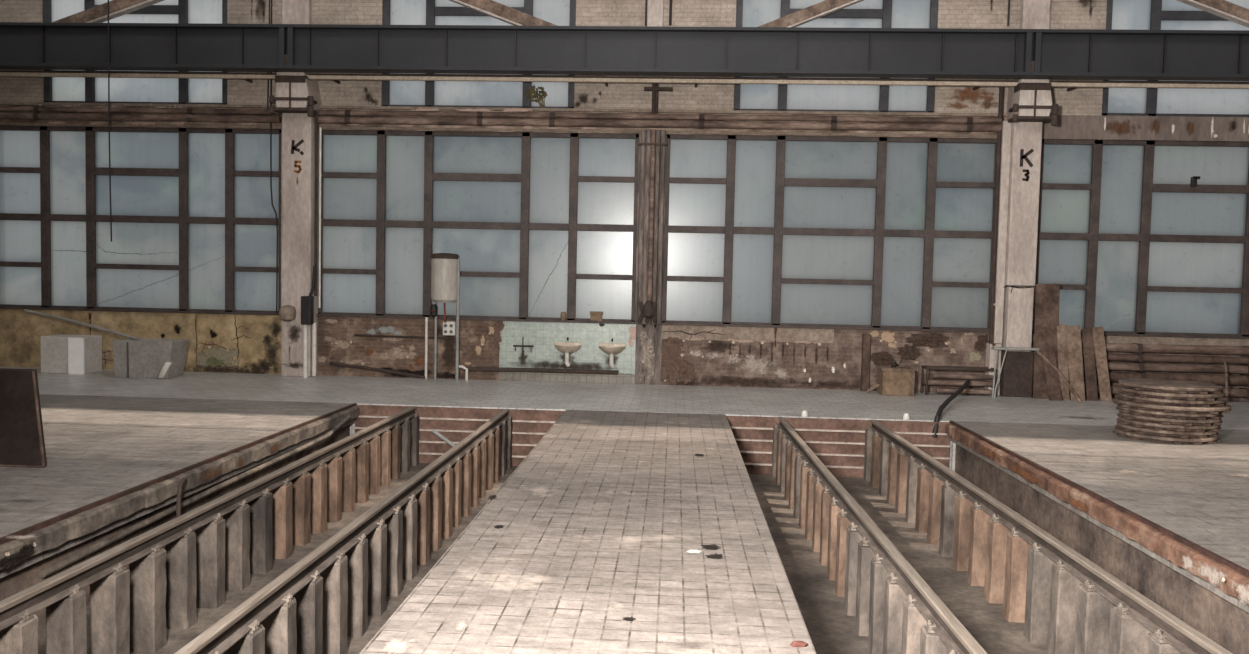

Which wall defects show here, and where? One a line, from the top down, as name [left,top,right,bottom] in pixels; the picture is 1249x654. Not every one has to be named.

water stain [194,321,303,374]
spalling [628,326,768,385]
spalling [869,300,996,366]